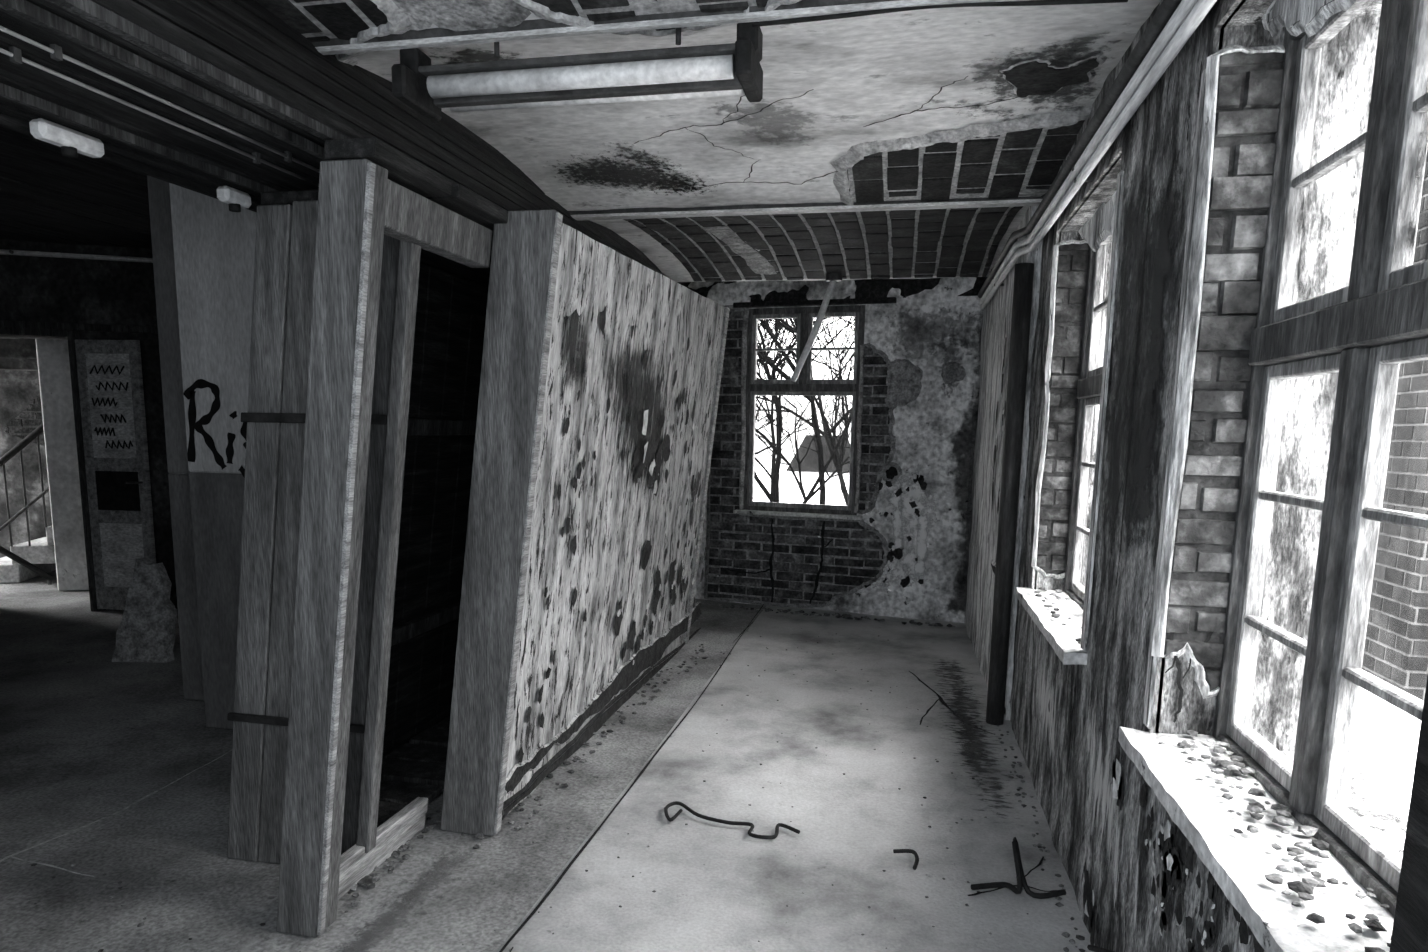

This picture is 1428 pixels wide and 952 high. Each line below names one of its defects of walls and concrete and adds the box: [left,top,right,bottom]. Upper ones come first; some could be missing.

flaking render [255,0,801,66]
water stain [958,33,1120,121]
peeling [1000,52,1107,98]
water stain [549,143,722,195]
flaking render [623,106,1092,282]
water stain [560,294,672,504]
flaking render [1143,0,1356,729]
flaking render [502,305,927,820]
water stain [1033,629,1141,930]